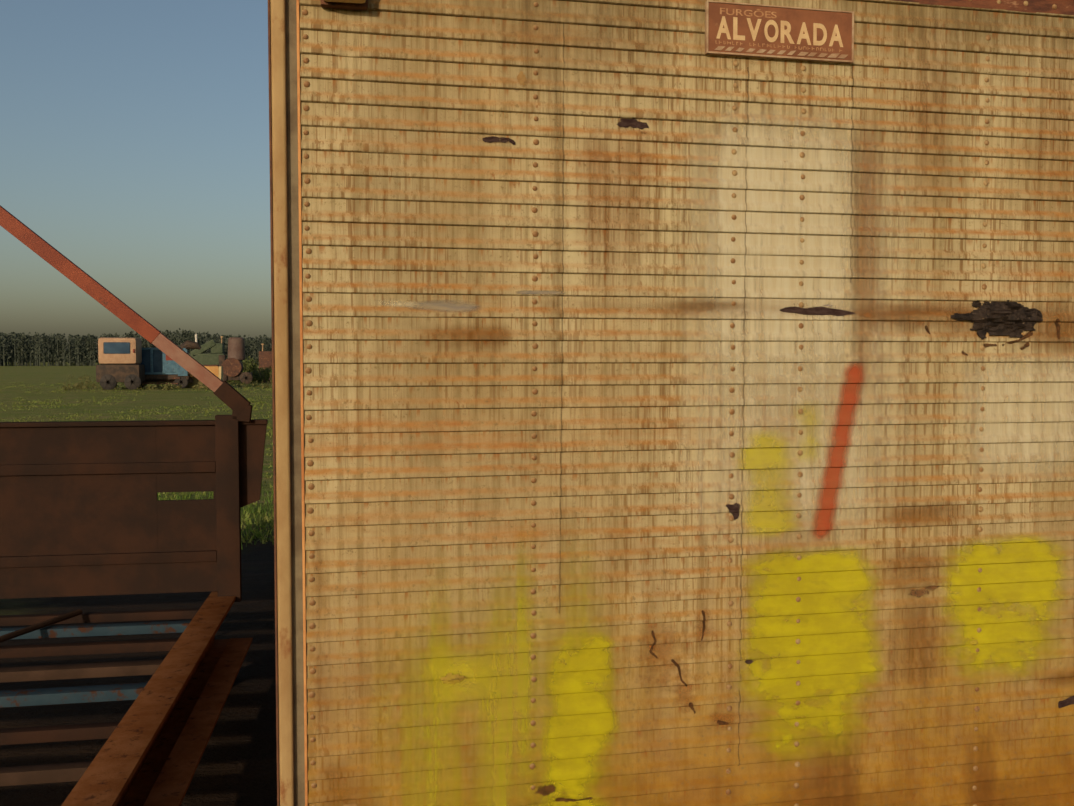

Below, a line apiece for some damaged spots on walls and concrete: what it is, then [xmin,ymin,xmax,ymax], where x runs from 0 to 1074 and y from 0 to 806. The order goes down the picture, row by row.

peeling [617,118,649,129]
peeling [482,136,516,145]
peeling [780,305,855,316]
peeling [950,300,991,339]
peeling [726,503,741,520]